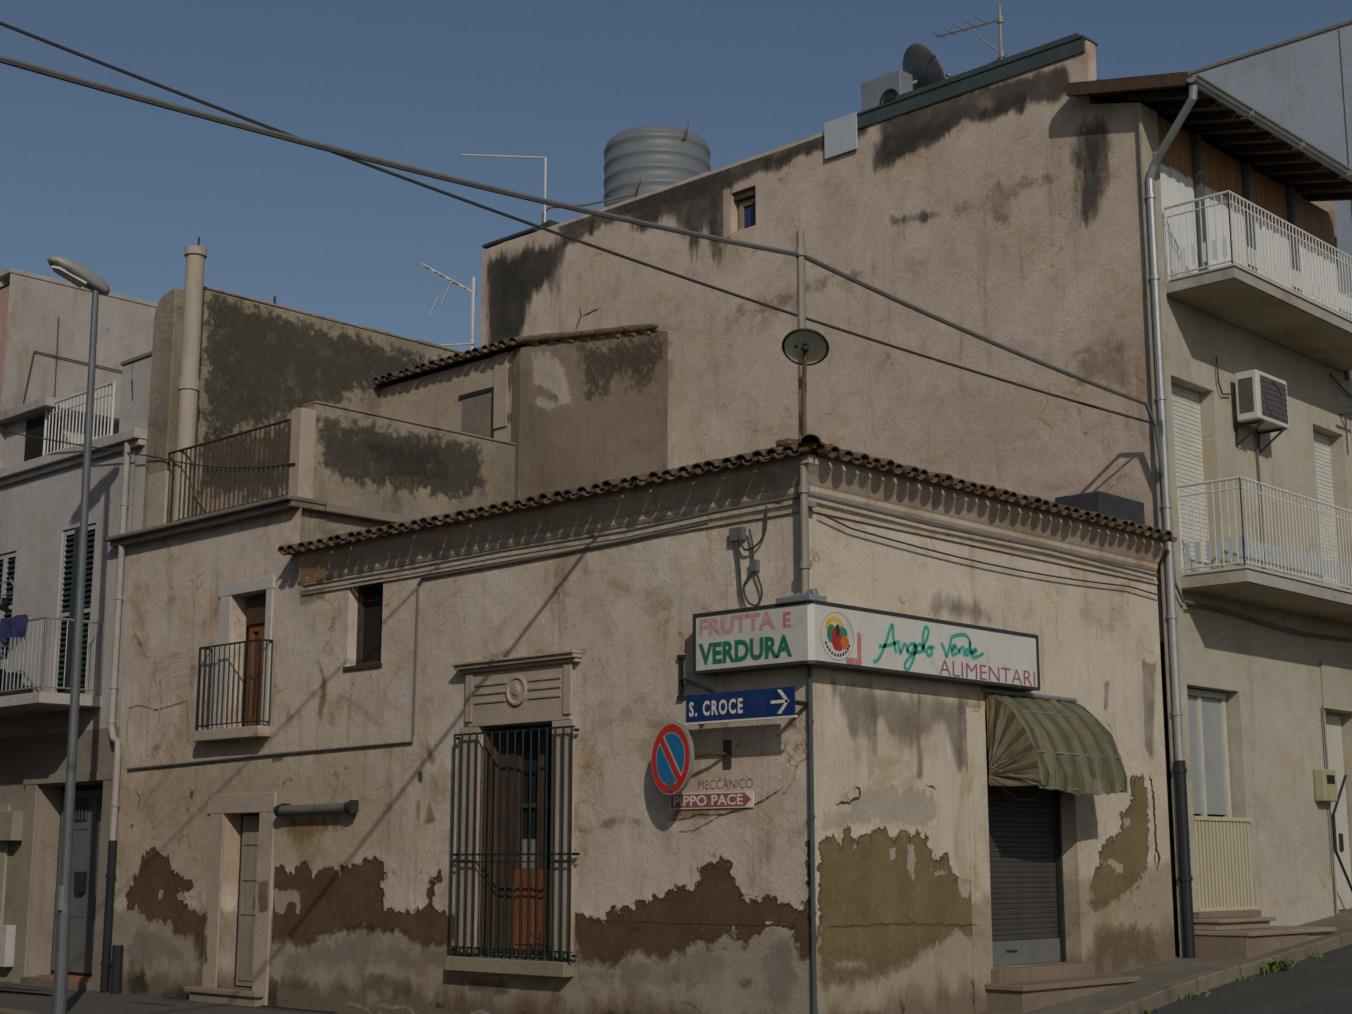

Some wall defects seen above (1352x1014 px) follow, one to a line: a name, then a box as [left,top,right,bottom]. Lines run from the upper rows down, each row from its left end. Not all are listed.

damp [874,66,1069,171]
damp [1074,123,1108,223]
damp [487,136,825,343]
damp [196,293,484,501]
damp [576,333,663,401]
flaking render [1090,773,1150,911]
flaking render [125,846,205,962]
flaking render [271,856,455,948]
flaking render [575,825,972,985]